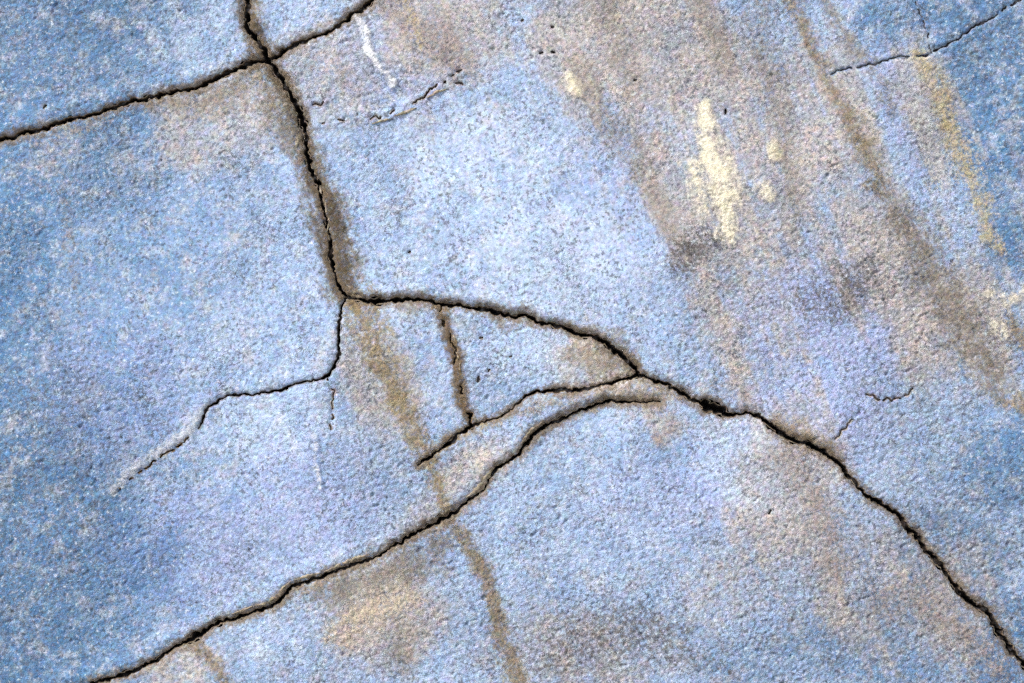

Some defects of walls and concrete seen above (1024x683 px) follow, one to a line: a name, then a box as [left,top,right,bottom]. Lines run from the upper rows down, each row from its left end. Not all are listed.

crack [0,59,267,143]
crack [197,0,1024,668]
crack [89,398,661,683]